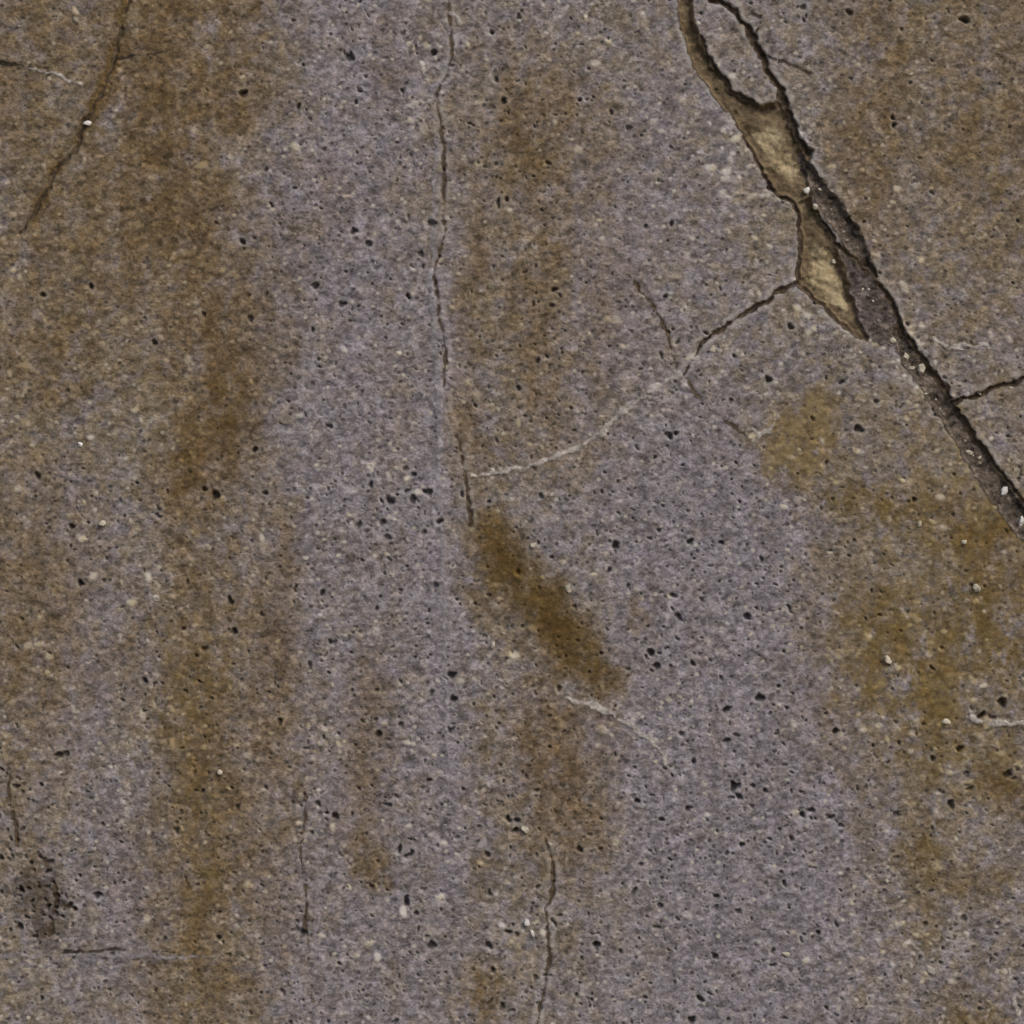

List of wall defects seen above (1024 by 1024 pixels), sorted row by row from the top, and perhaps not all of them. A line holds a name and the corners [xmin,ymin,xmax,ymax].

crack [0,0,162,234]
crack [433,0,454,401]
crack [600,0,1024,541]
crack [455,434,473,527]
crack [536,840,555,1024]